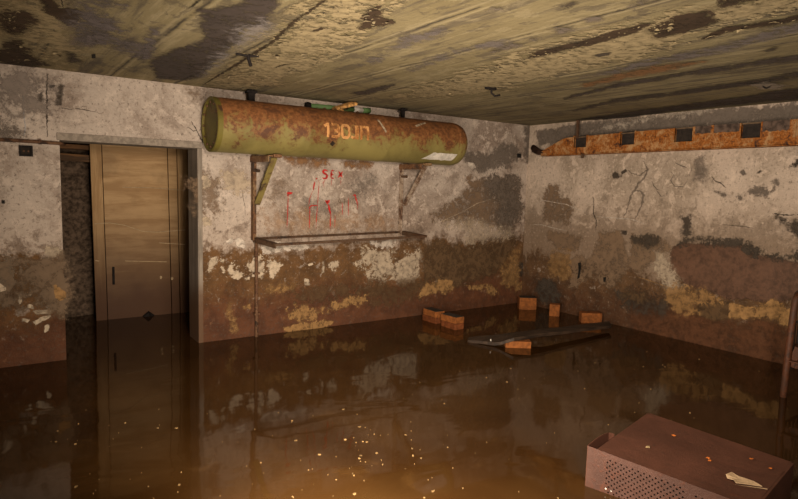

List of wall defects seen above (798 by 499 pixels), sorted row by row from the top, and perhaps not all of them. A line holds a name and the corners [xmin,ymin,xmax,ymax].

damp [64,0,282,81]
damp [564,24,798,100]
damp [430,72,798,321]
peeling [18,296,51,332]
peeling [284,303,334,332]
damp [331,294,368,312]